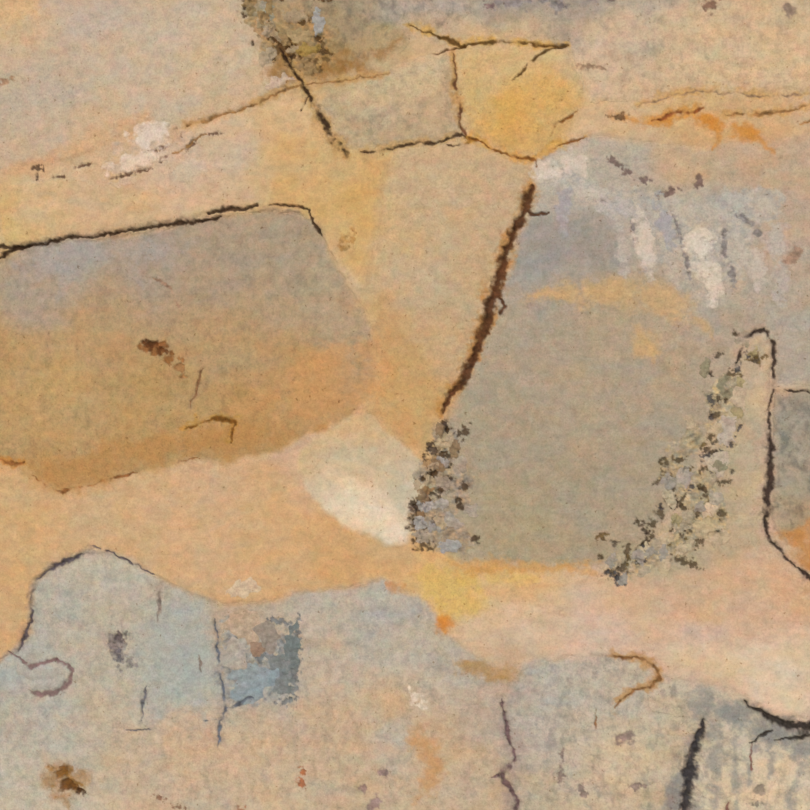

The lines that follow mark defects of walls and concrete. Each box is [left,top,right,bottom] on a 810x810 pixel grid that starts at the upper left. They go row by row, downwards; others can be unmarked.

spalling [234,0,343,88]
crack [0,202,323,266]
crack [171,17,592,421]
spalling [402,416,484,556]
spalling [594,346,766,587]
crack [725,320,810,594]
crack [668,715,738,810]
crack [739,691,810,772]